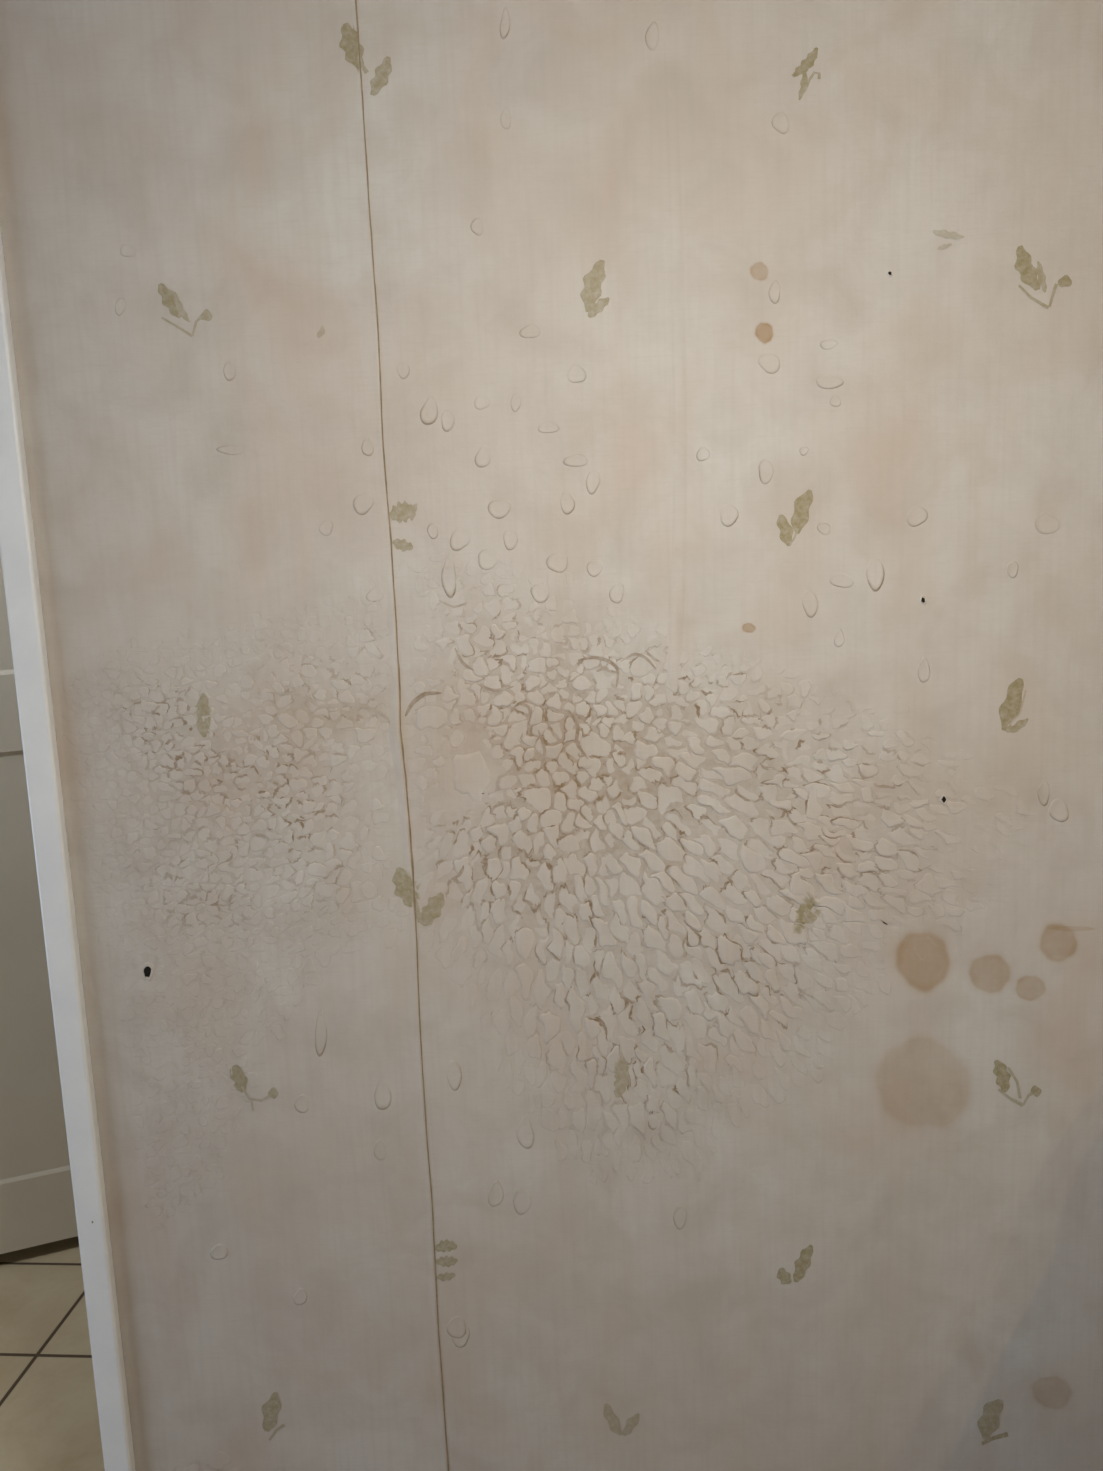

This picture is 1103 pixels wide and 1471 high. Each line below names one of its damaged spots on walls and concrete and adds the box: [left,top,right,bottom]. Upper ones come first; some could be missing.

crack [63,0,737,1471]
leakage [180,584,1103,1006]
crack [648,648,994,965]
crack [641,865,865,1103]
leakage [859,1019,988,1149]